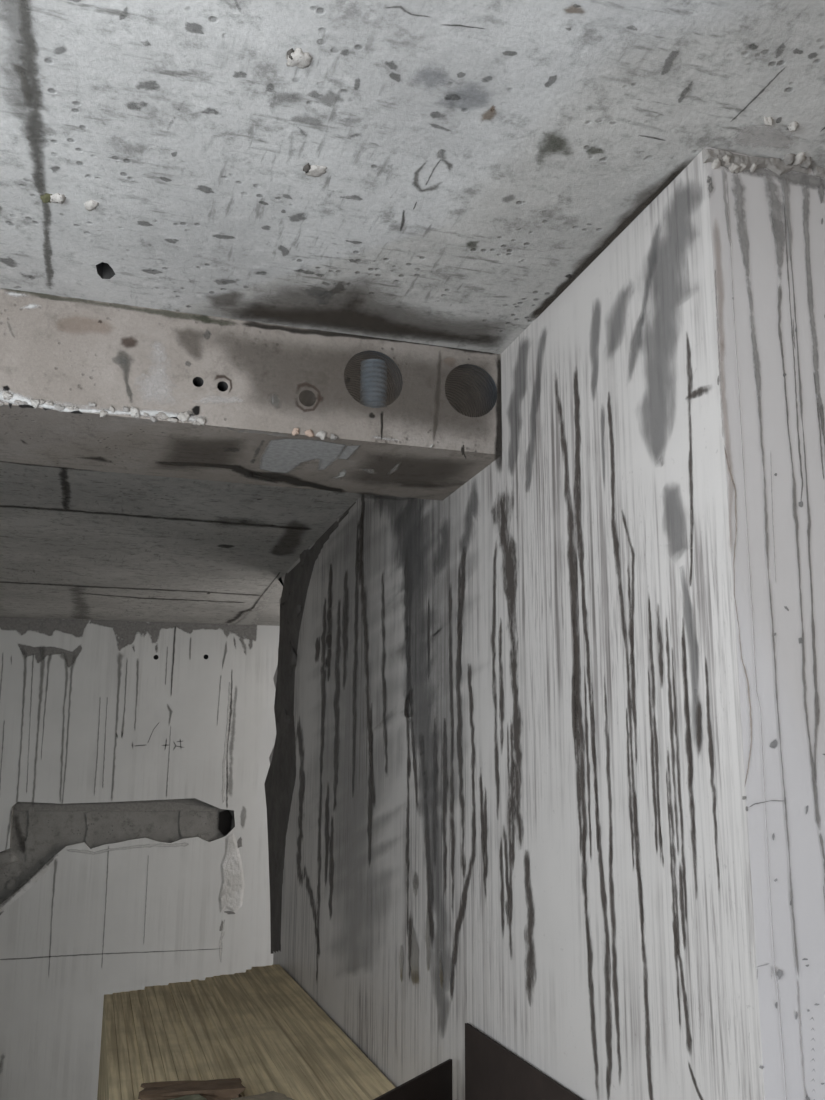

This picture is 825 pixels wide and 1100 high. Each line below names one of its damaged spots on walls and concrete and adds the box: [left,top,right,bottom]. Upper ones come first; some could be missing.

crack [14,0,53,286]
spalling [0,386,206,426]
spalling [0,798,245,960]
leakage [0,617,257,846]
spalling [226,493,398,954]
leakage [242,301,544,488]
leakage [378,490,535,1030]
leakage [555,372,621,1097]
leakage [533,169,692,457]
leakage [601,393,652,1100]
leakage [648,584,719,1100]
leakage [725,168,825,1100]